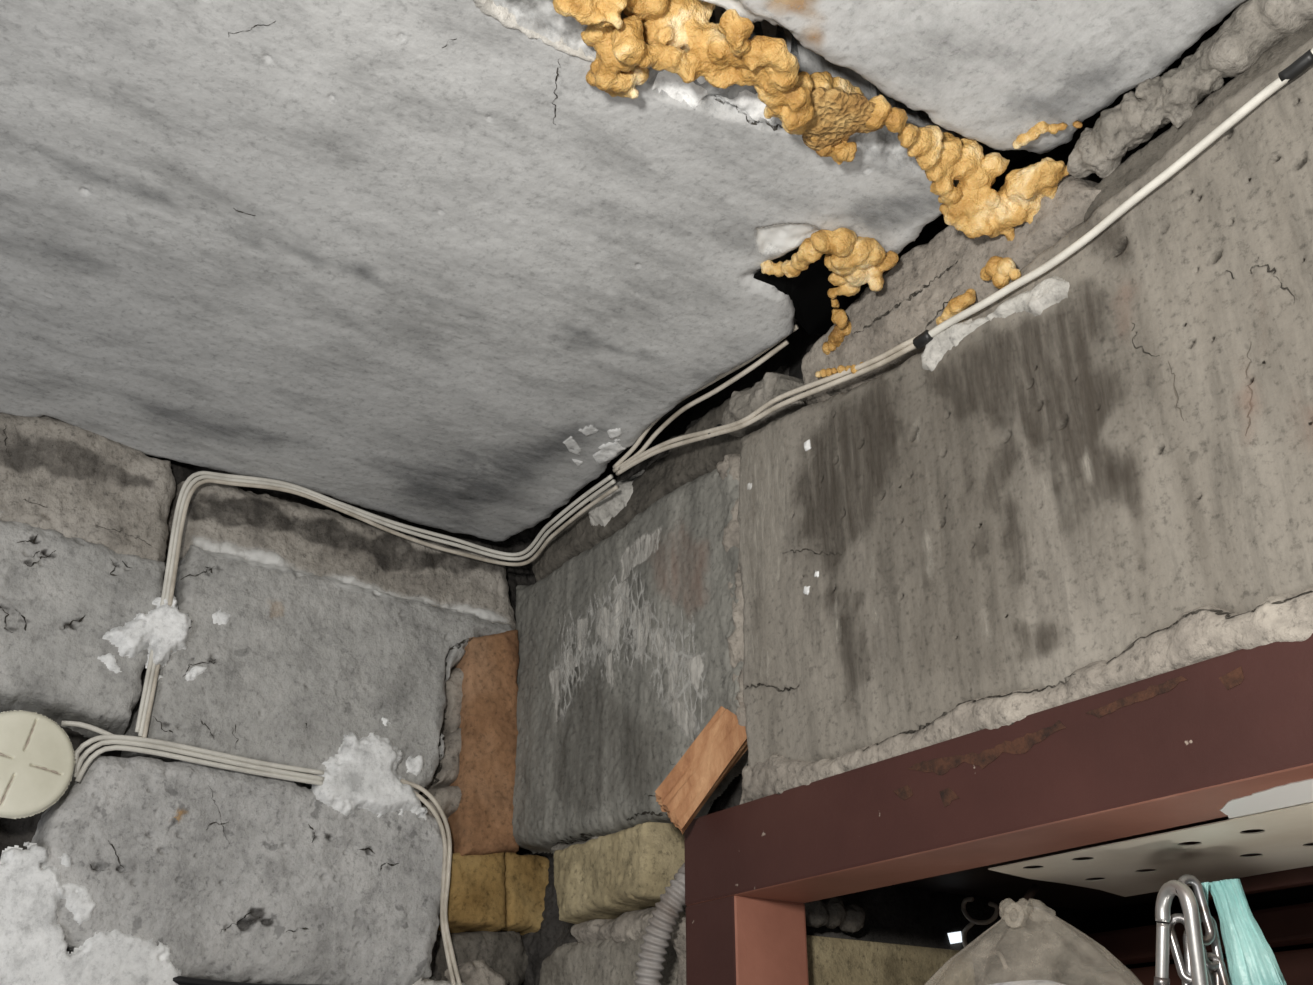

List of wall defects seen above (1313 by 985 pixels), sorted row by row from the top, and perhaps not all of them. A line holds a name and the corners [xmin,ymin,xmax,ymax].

crack [552,62,561,124]
crack [714,95,783,131]
crack [854,261,958,333]
water stain [806,396,895,562]
water stain [959,294,1132,499]
water stain [549,529,708,741]